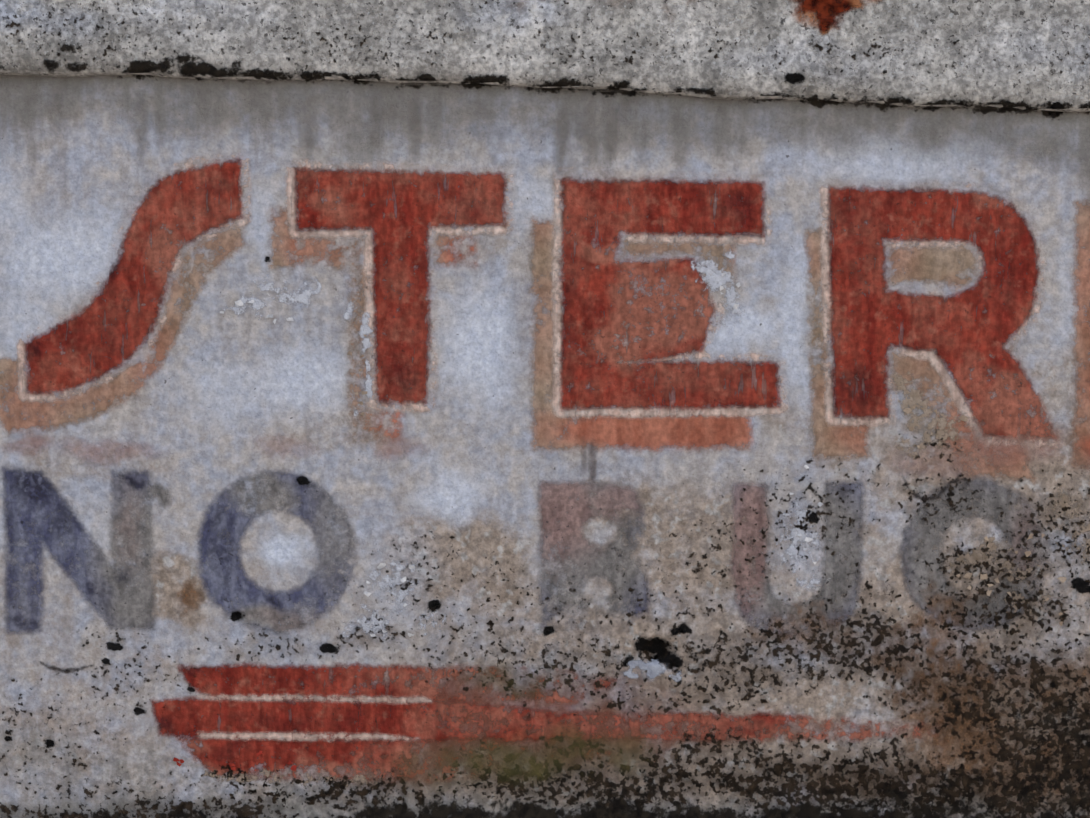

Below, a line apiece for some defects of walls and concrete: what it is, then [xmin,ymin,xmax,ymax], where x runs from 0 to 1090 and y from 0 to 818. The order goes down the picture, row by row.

corrosion [797,0,876,34]
peeling [220,279,322,324]
peeling [691,249,745,326]
damp [0,431,1090,818]
hole [623,623,692,682]